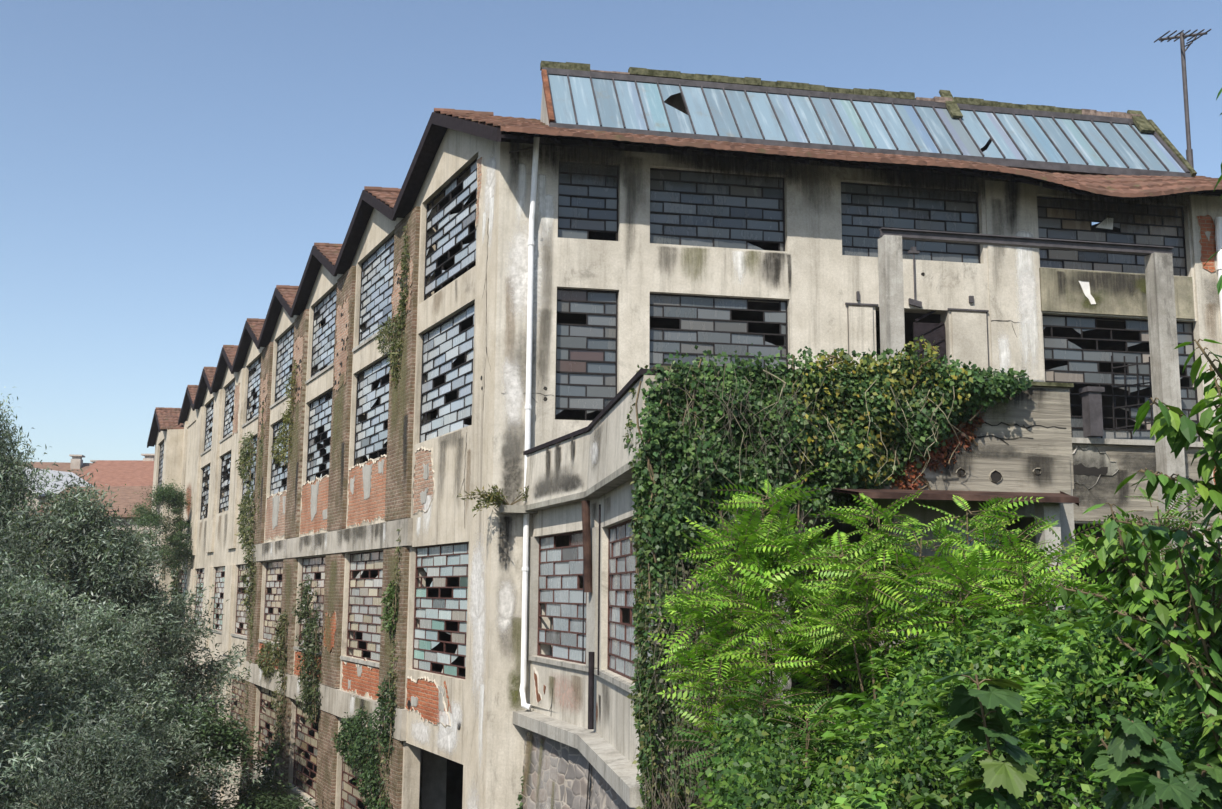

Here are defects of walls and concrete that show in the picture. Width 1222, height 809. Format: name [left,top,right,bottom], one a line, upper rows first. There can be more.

damp [733,251,791,286]
flaking render [1196,214,1216,273]
damp [499,139,553,564]
flaking render [264,475,329,542]
flaking render [347,454,387,528]
damp [535,437,580,497]
crack [974,422,1066,445]
flaking render [293,610,379,701]
damp [470,551,484,749]
damp [499,584,522,663]
flaking render [405,676,461,730]
damp [412,703,462,752]